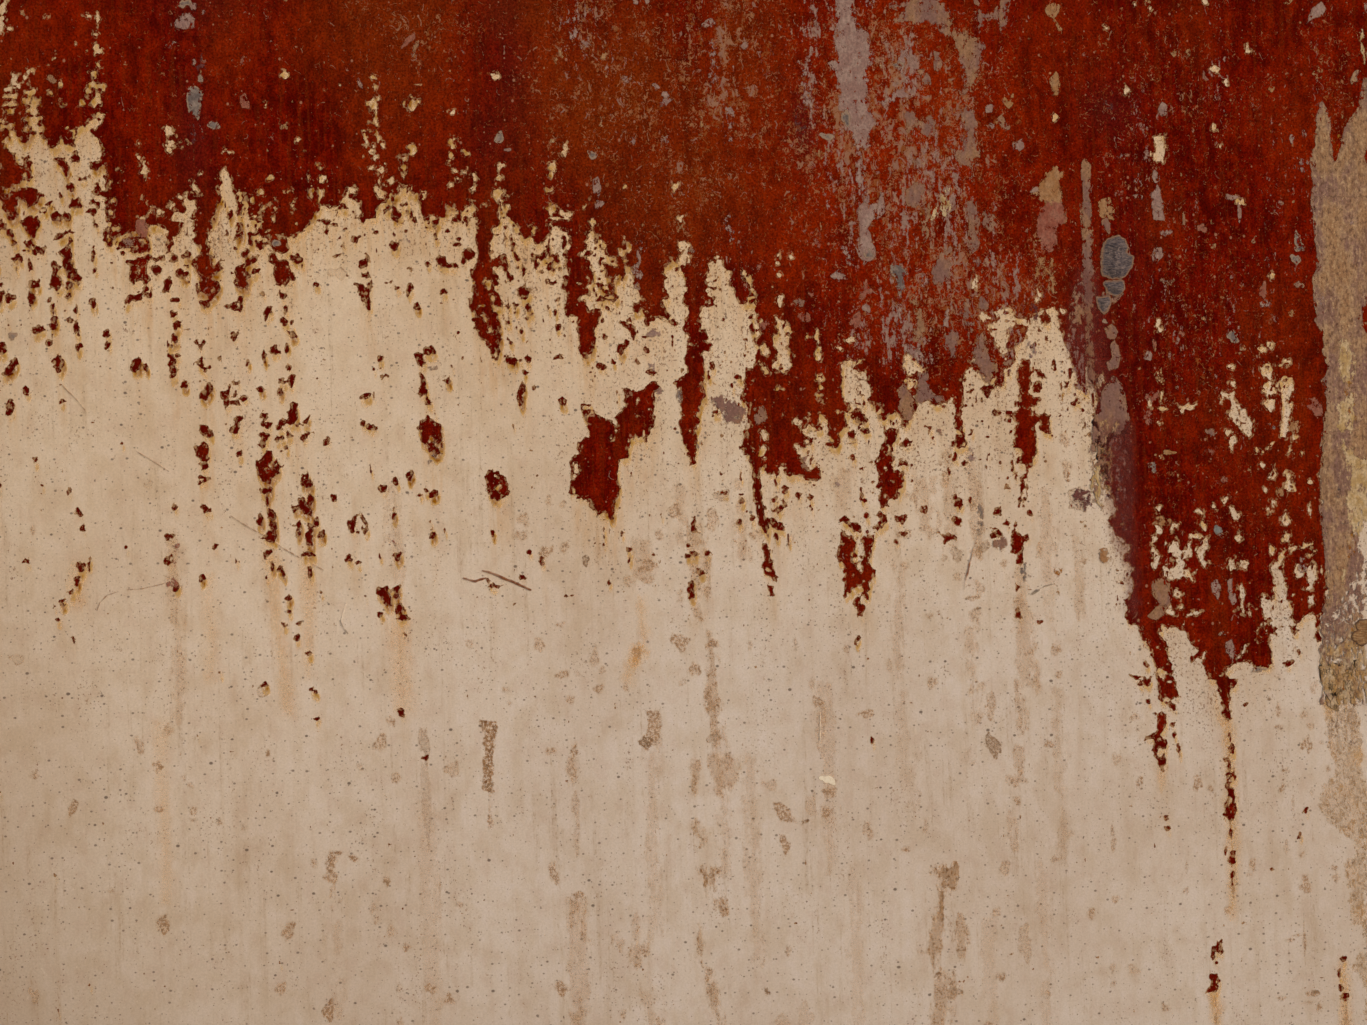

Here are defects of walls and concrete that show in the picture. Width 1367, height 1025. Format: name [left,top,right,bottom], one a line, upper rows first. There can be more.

peeling [166,0,205,47]
leakage [1308,2,1326,22]
peeling [187,53,220,145]
peeling [881,0,1024,181]
peeling [888,168,998,273]
peeling [1030,159,1207,512]
corrosion [414,345,468,465]
corrosion [194,424,215,487]
corrosion [484,469,510,507]
leakage [1301,29,1367,935]
corrosion [990,506,1029,570]
corrosion [364,551,412,637]